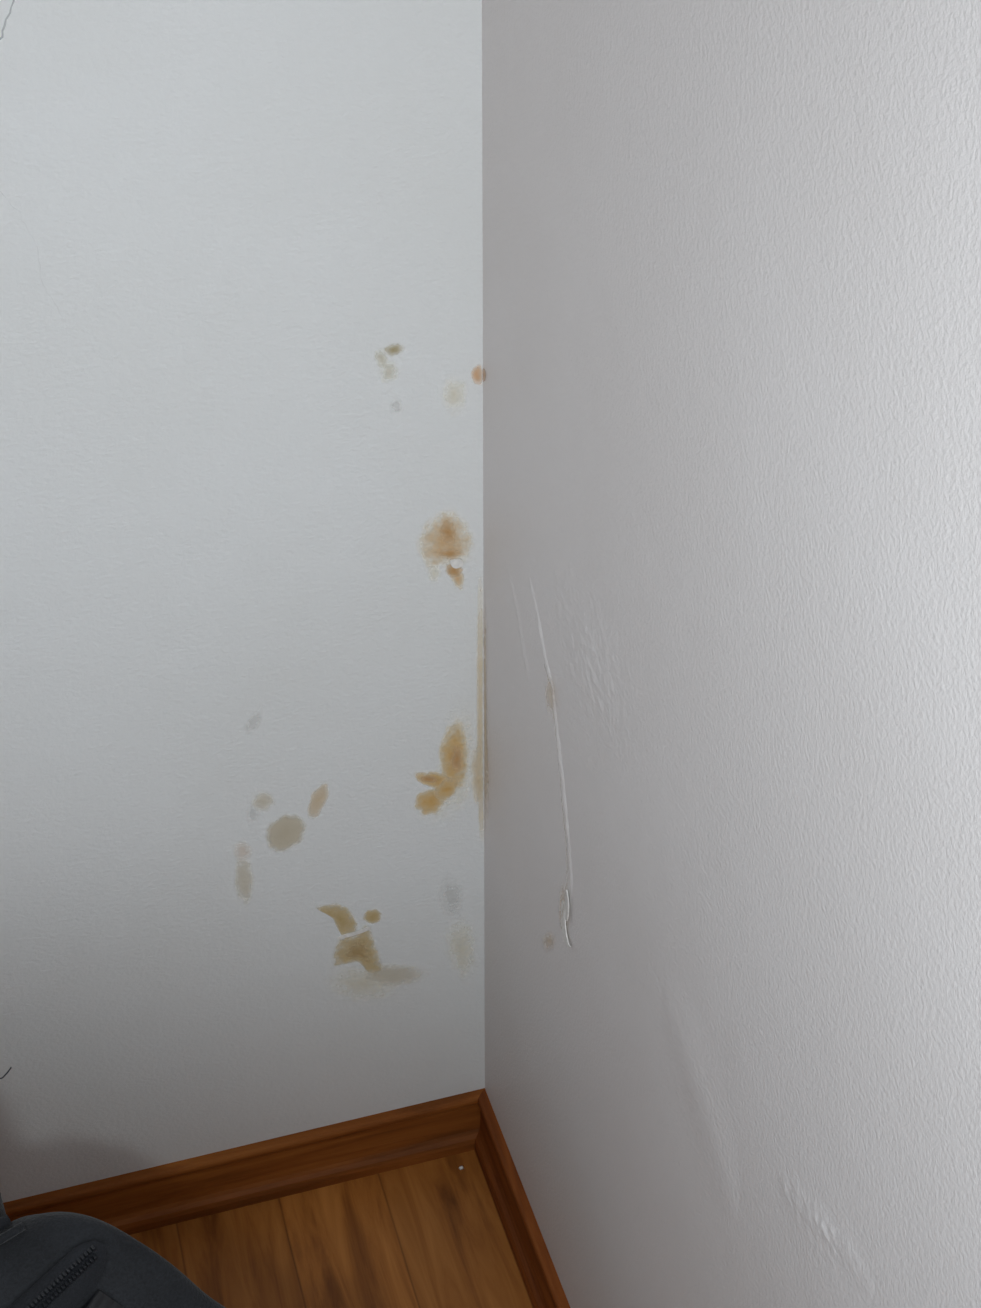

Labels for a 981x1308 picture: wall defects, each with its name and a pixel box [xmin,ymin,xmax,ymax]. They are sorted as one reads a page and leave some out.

crack [0,0,14,40]
water stain [422,514,470,586]
water stain [416,656,483,819]
water stain [268,785,327,850]
water stain [319,905,416,983]